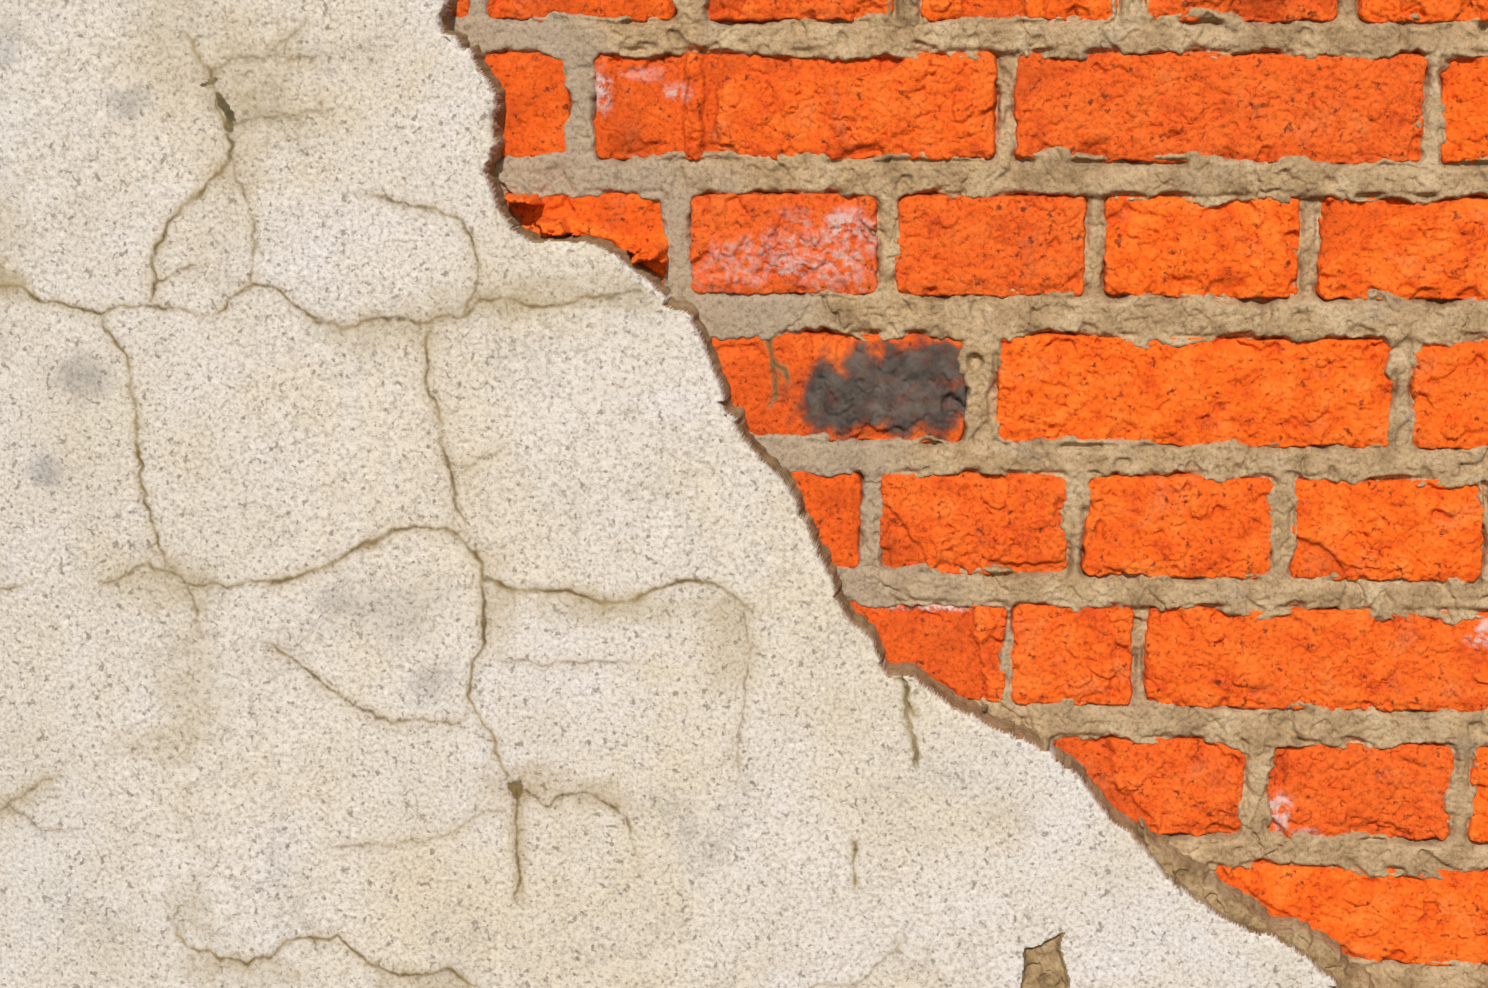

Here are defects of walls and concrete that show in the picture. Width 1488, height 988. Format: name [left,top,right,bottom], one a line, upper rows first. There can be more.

spalling [684,51,1488,165]
spalling [690,191,1488,302]
crack [766,340,789,401]
spalling [996,331,1488,450]
crack [0,39,715,895]
spalling [881,470,1274,579]
spalling [972,603,1488,712]
crack [898,677,919,763]
spalling [1268,742,1488,843]
crack [177,935,469,984]
crack [851,841,859,885]
spalling [1222,859,1488,966]